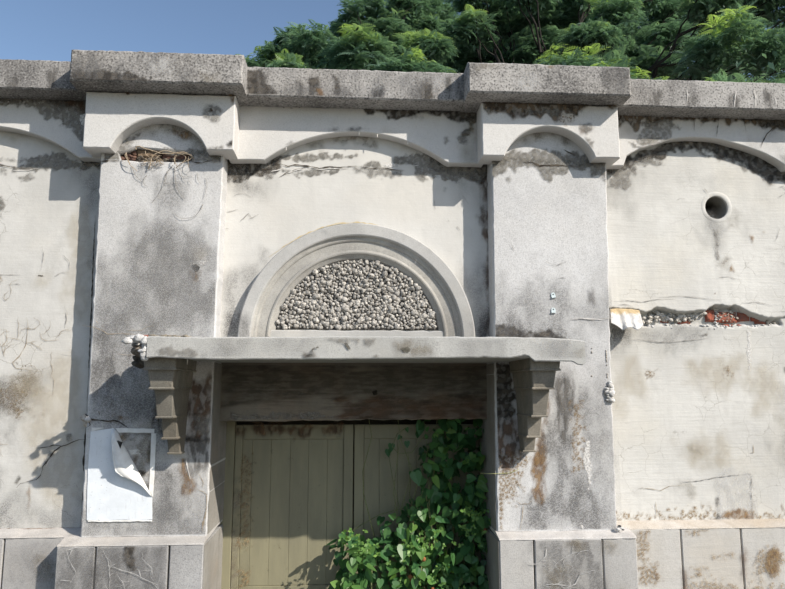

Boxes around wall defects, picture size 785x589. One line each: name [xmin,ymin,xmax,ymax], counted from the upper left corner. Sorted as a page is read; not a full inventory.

peeling [0,99,86,141]
peeling [13,153,101,180]
peeling [227,148,606,184]
spalling [610,308,780,330]
crack [1,227,150,487]
rust [496,363,546,529]
damp [530,378,600,529]
rust [649,507,780,520]
rust [755,548,785,589]